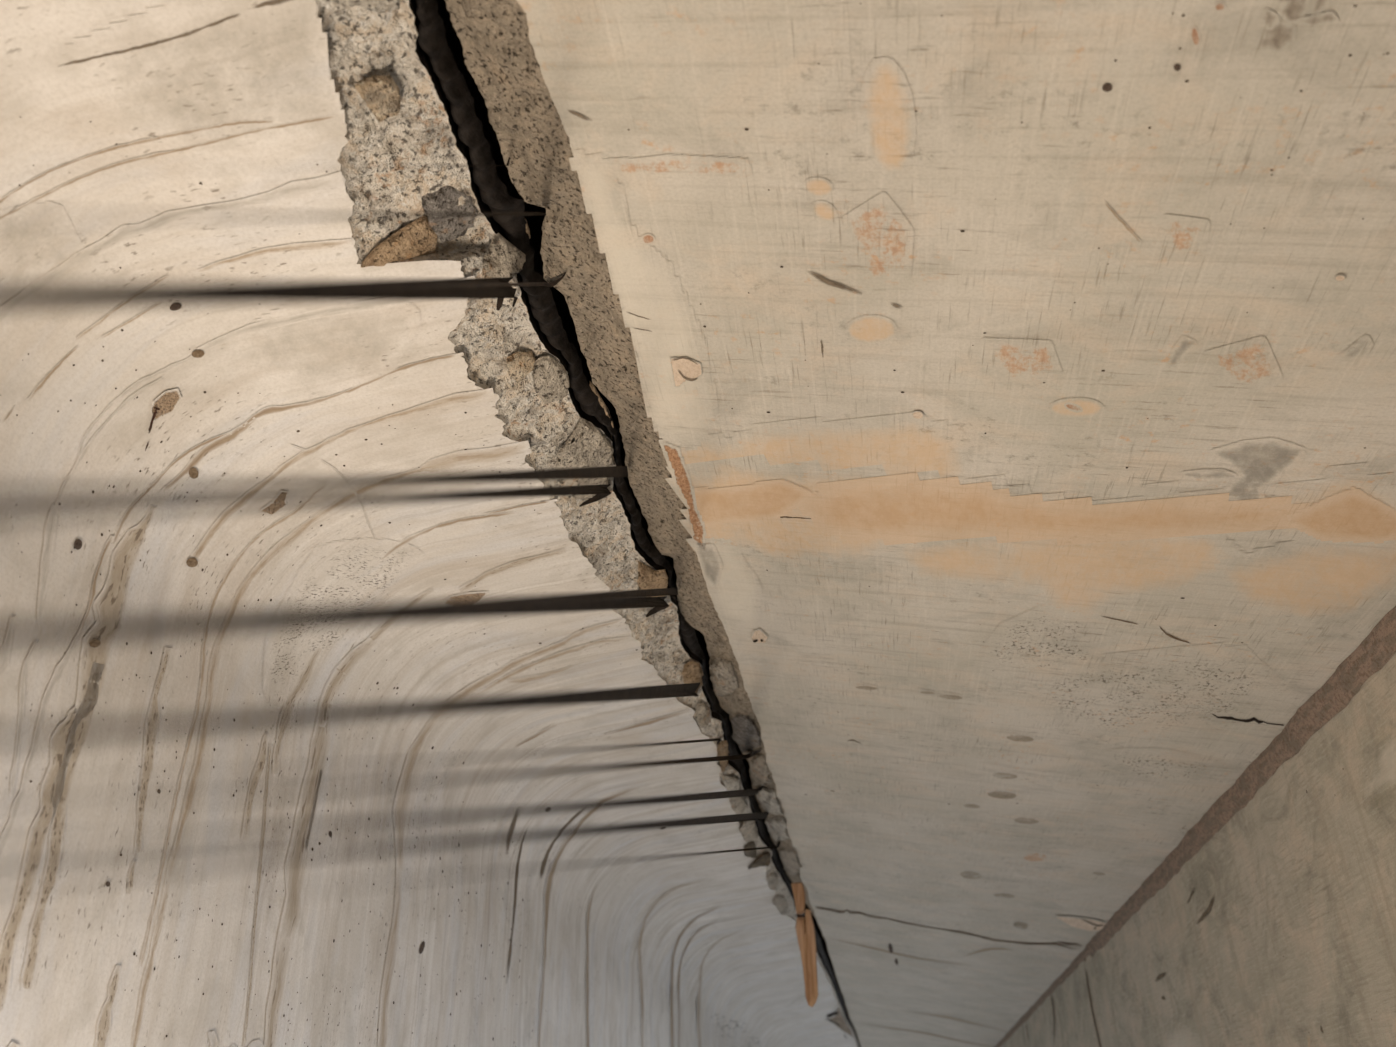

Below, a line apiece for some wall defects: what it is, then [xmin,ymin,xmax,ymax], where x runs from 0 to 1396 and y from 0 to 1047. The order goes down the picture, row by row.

damp [1256,0,1339,53]
crack [0,0,1101,1047]
spalling [315,0,861,1047]
rust [663,442,706,550]
damp [569,149,1396,628]
crack [1212,714,1284,726]